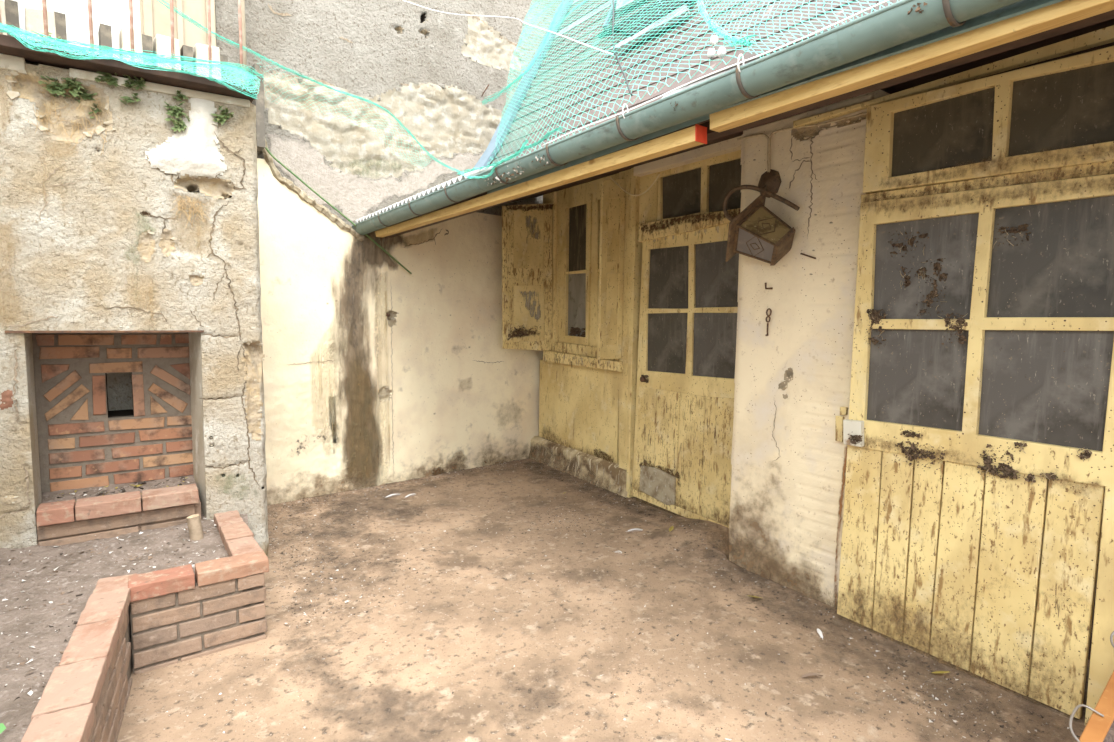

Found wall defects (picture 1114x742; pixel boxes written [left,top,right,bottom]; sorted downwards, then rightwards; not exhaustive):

crack [789,134,817,239]
crack [94,132,261,491]
leakage [297,232,404,537]
peeling [778,368,794,400]
leakage [411,455,466,479]
leakage [706,506,848,631]